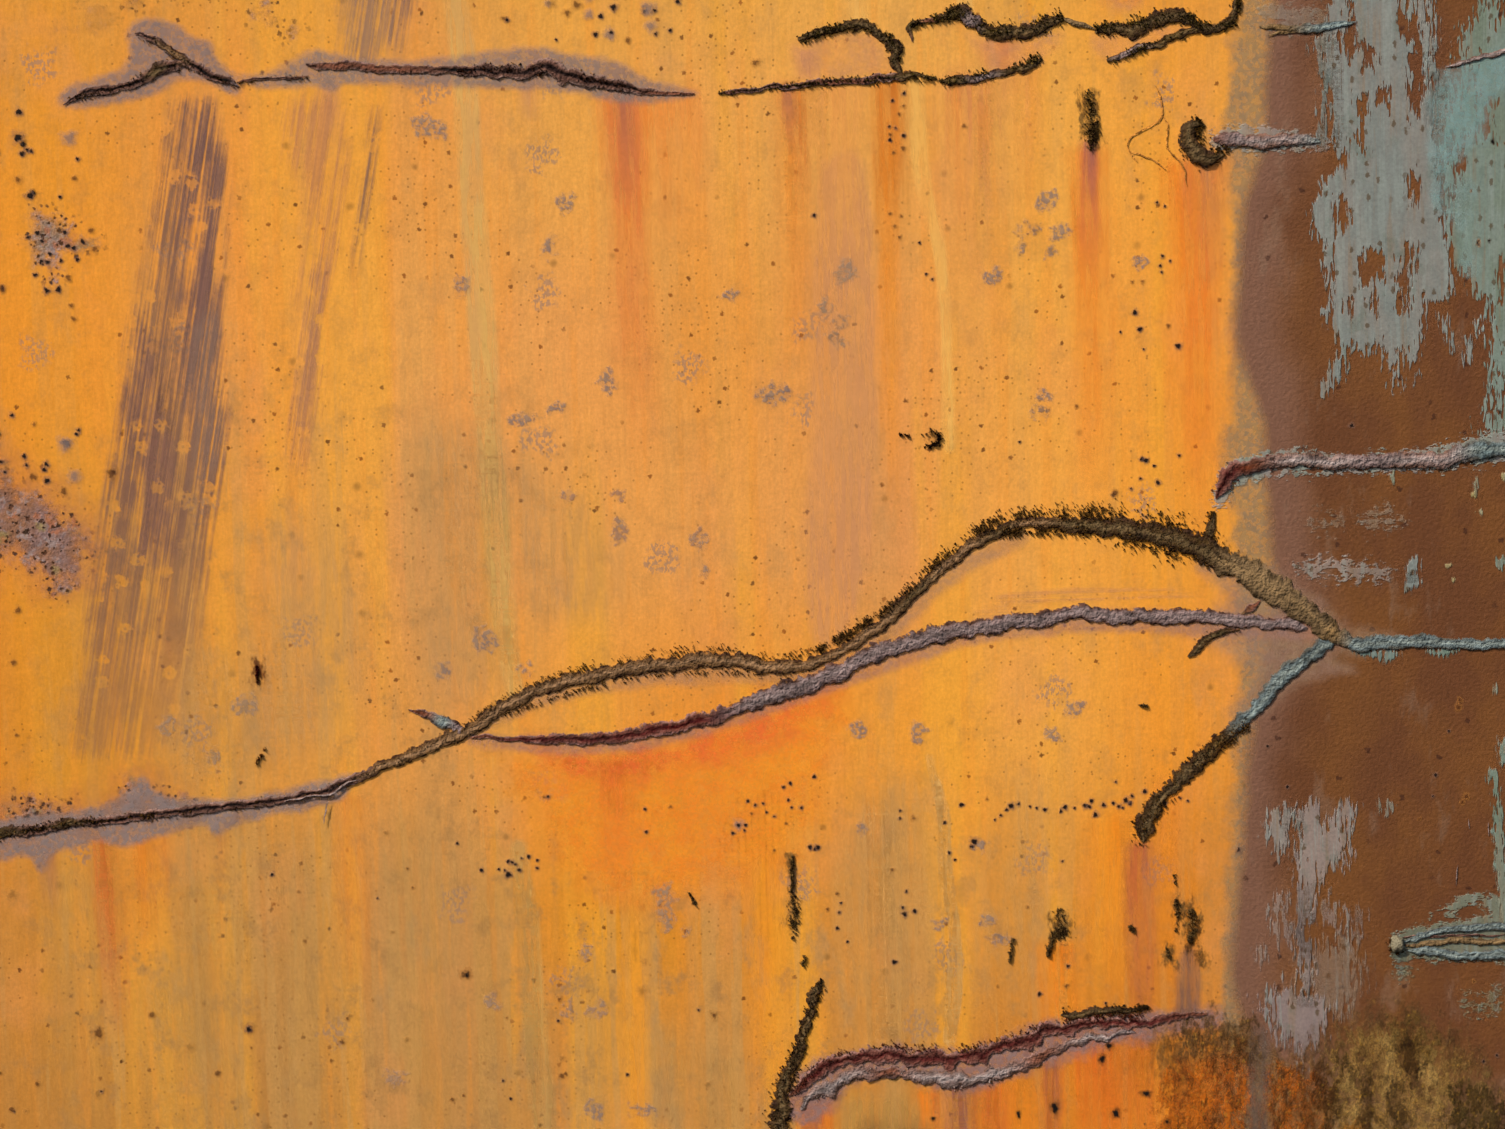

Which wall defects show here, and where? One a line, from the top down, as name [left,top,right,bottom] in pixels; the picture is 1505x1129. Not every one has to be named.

crack [59,0,1356,108]
crack [1127,87,1334,186]
spalling [0,427,81,496]
crack [0,429,1505,872]
crack [1386,892,1505,974]
crack [762,978,1223,1129]